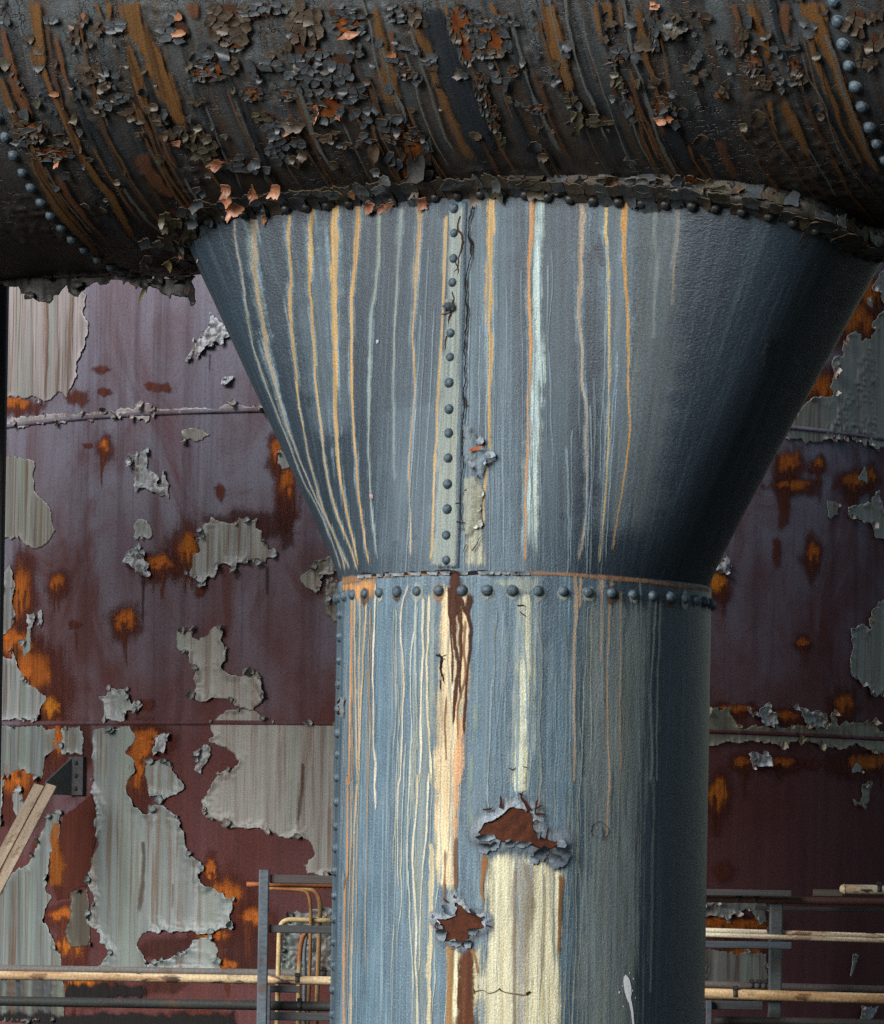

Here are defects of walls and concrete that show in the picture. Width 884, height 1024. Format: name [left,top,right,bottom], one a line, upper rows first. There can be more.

peeling [5,456,55,549]
rust [1,538,96,966]
peeling [0,565,235,968]
peeling [184,516,277,588]
peeling [175,624,335,876]
rust [109,203,494,1024]
peeling [0,0,884,451]
crack [357,206,530,580]
peeling [429,888,494,953]
peeling [468,791,576,870]
rust [501,200,733,969]
rust [761,445,882,566]